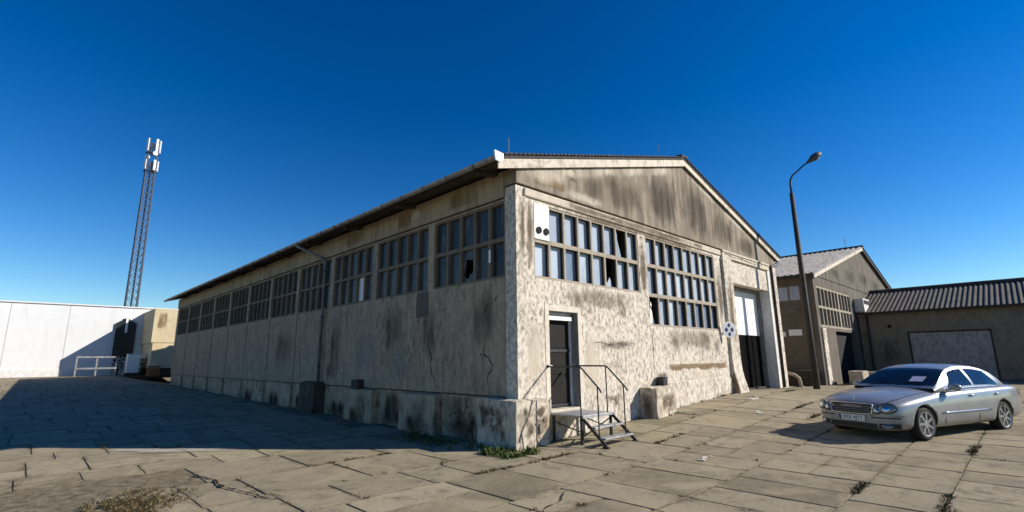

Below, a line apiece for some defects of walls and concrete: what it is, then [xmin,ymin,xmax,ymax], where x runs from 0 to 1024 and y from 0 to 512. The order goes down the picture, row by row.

water stain [521,211,532,259]
water stain [534,168,700,247]